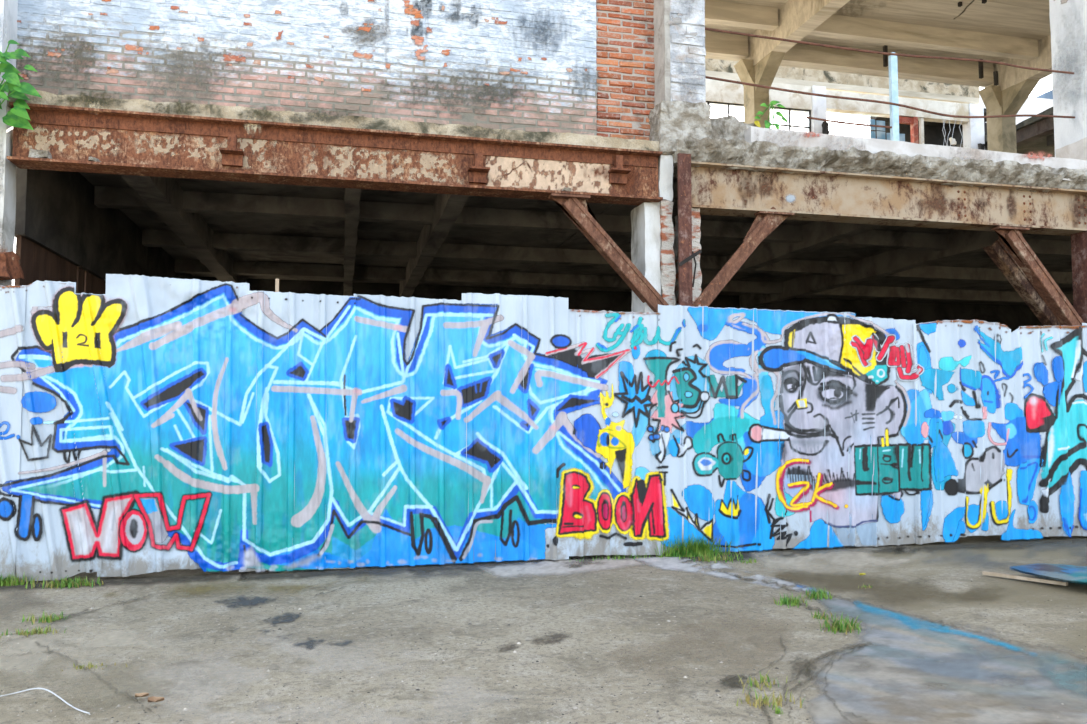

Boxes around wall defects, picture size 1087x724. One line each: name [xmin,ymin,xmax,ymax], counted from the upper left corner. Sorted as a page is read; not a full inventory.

spalling [403,0,432,60]
water stain [18,35,94,86]
peeling [125,44,149,55]
peeling [223,42,261,66]
flaking render [585,0,655,140]
water stain [148,101,200,114]
water stain [403,70,521,110]
spalling [672,136,1087,192]
corrosion [709,168,773,205]
corrosion [920,184,952,211]
corrosion [1007,190,1016,215]
corrosion [1073,195,1087,225]